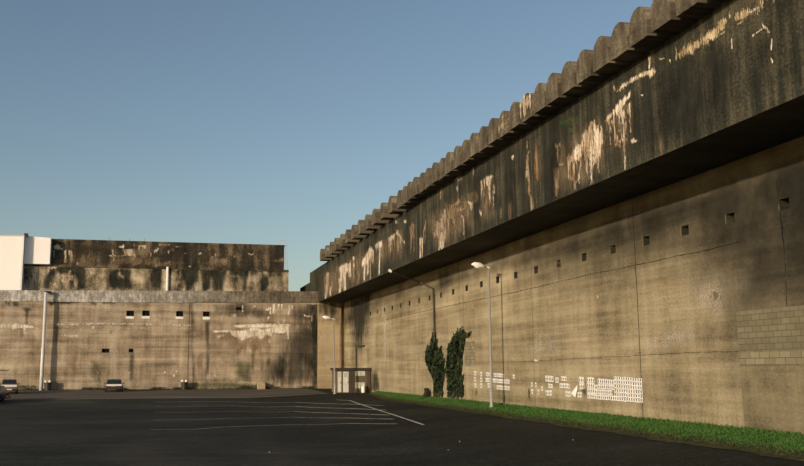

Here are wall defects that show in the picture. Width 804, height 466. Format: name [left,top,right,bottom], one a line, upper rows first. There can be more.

peeling [553,0,764,197]
leakage [546,147,557,195]
leakage [637,160,804,229]
peeling [325,176,495,299]
leakage [44,267,86,289]
leakage [107,268,131,289]
leakage [150,269,161,289]
leakage [171,269,281,291]
peeling [204,304,293,343]
leakage [261,294,370,386]